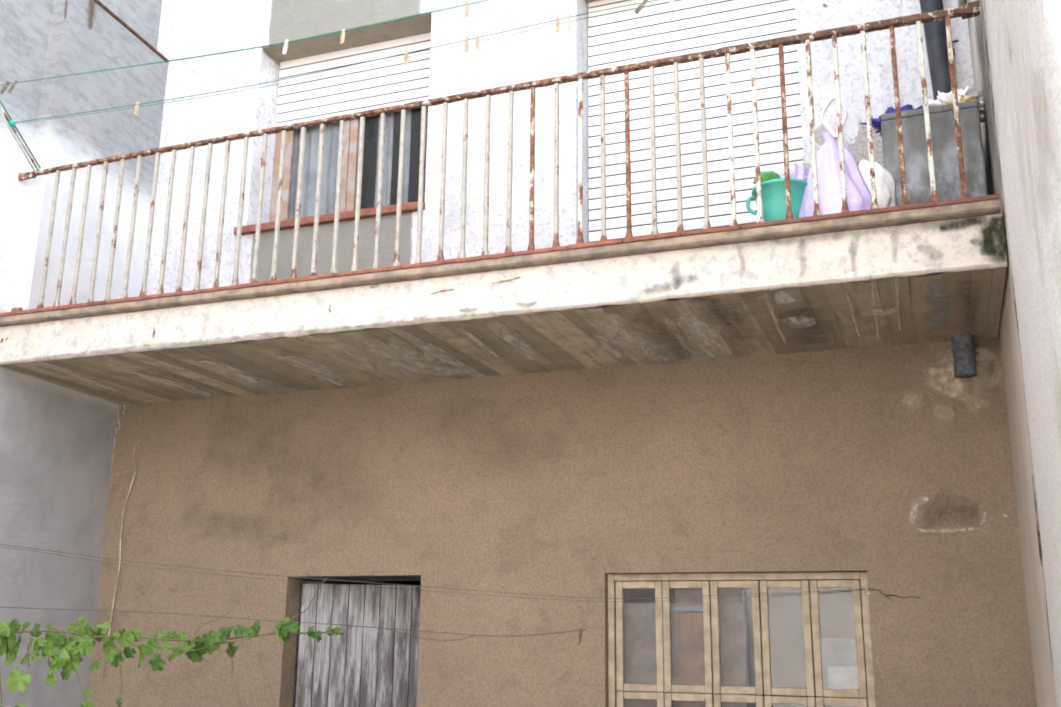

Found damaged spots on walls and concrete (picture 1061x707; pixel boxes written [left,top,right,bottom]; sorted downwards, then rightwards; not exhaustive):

flaking render [903,347,1004,420]